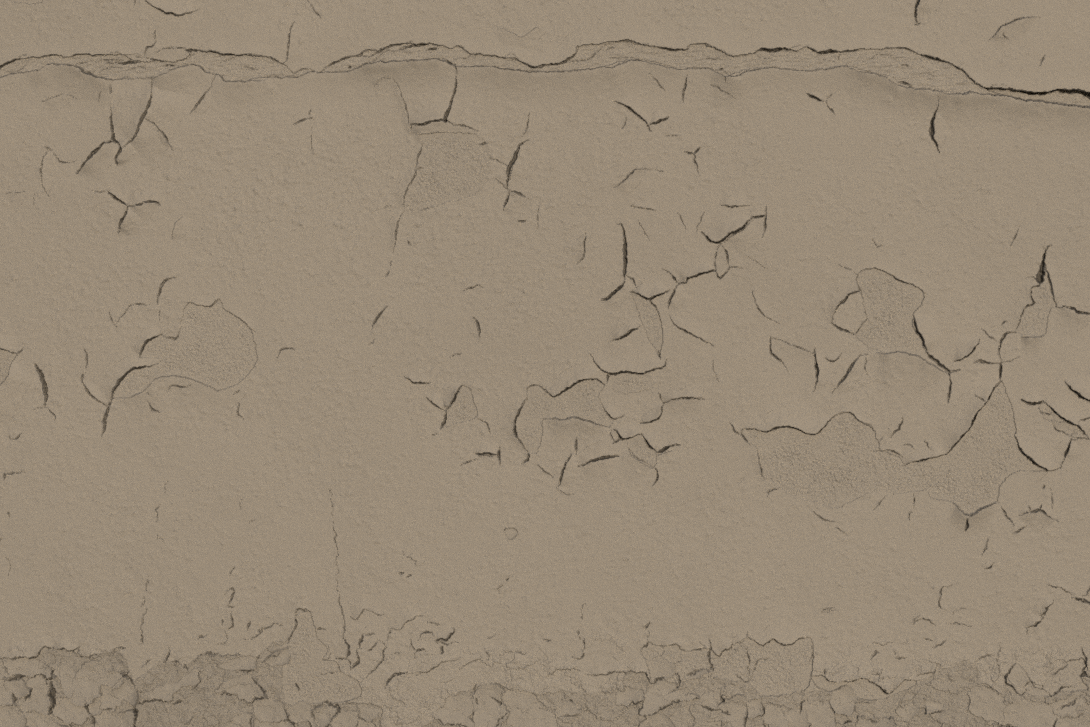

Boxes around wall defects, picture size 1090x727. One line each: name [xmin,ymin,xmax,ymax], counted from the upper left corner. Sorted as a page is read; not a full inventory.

crack [915,0,943,17]
crack [992,17,1036,41]
peeling [0,25,1090,250]
crack [618,98,700,158]
crack [809,93,830,102]
crack [930,96,946,150]
peeling [76,297,258,430]
crack [406,374,429,384]
peeling [503,231,714,486]
peeling [729,241,1090,530]
peeling [0,601,480,727]
peeling [616,621,1090,727]